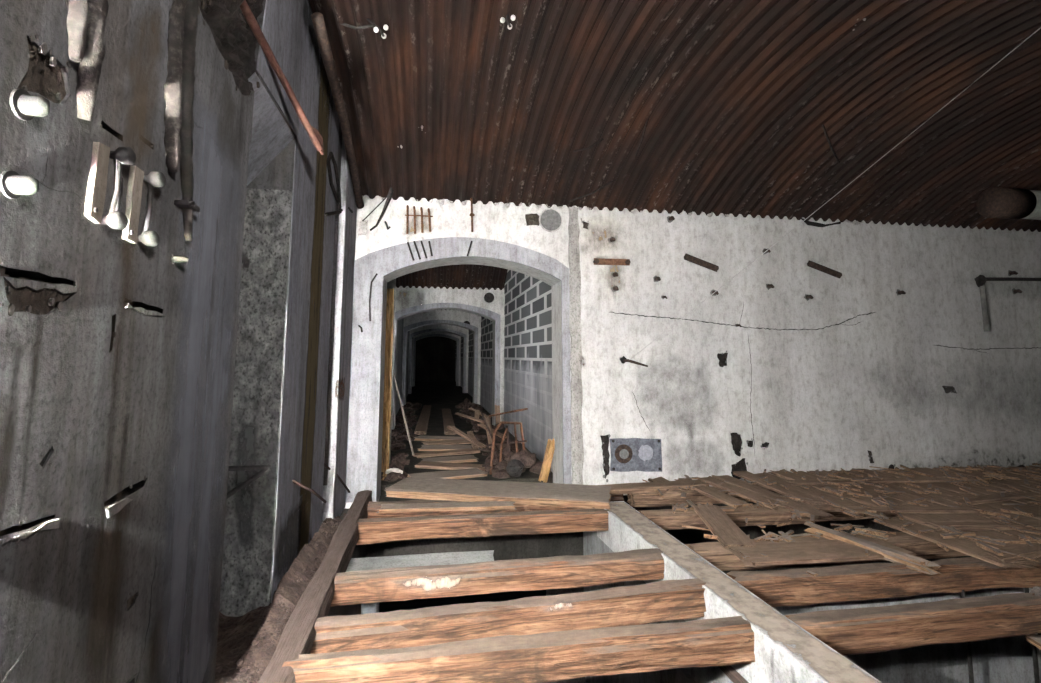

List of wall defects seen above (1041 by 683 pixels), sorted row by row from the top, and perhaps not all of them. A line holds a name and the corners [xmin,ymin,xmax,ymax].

spalling [17,34,72,104]
spalling [198,0,264,96]
spalling [0,267,77,316]
spalling [730,433,769,479]